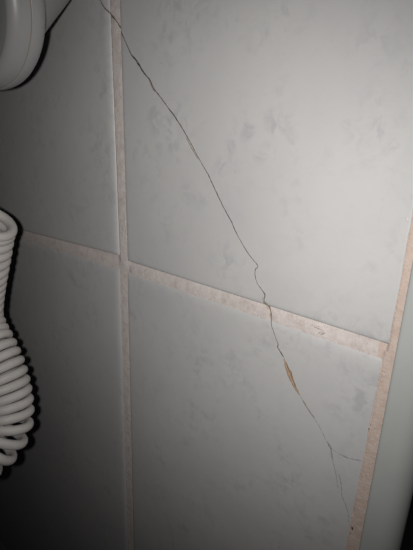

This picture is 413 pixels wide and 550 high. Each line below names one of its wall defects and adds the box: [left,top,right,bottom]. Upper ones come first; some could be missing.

crack [100,0,283,356]